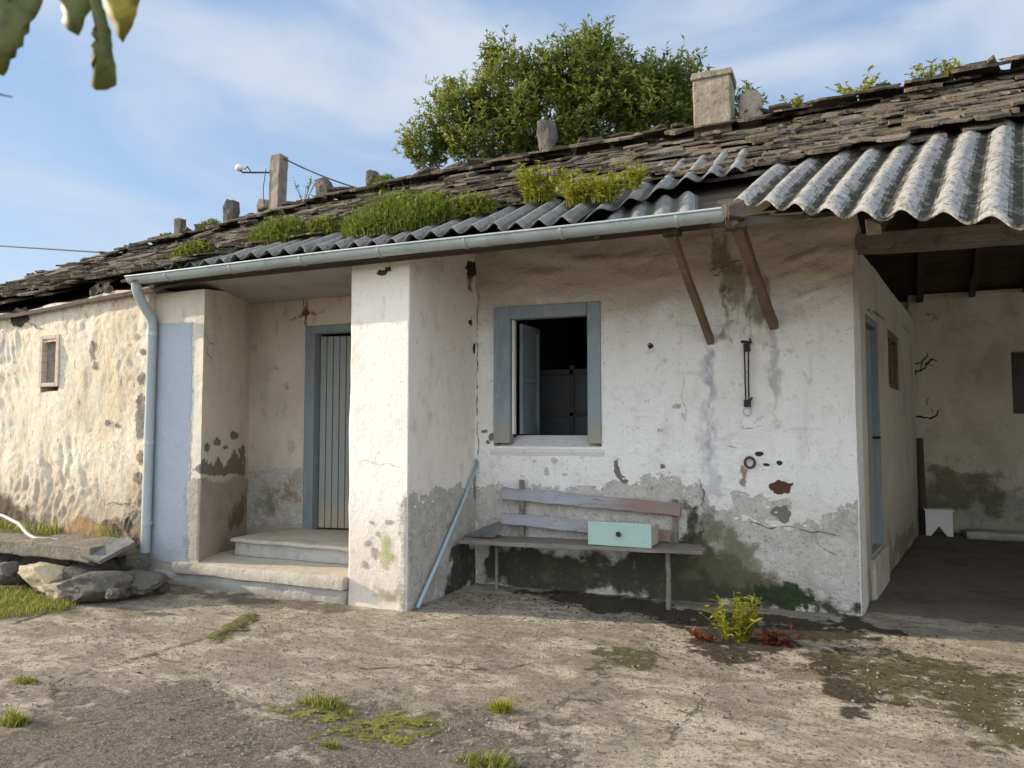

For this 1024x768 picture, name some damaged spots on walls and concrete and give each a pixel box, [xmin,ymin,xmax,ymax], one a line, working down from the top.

peeling [183,430,303,561]
peeling [361,458,864,615]
damp [445,501,785,608]
crack [749,521,837,556]
damp [798,574,872,614]
damp [926,465,1004,516]